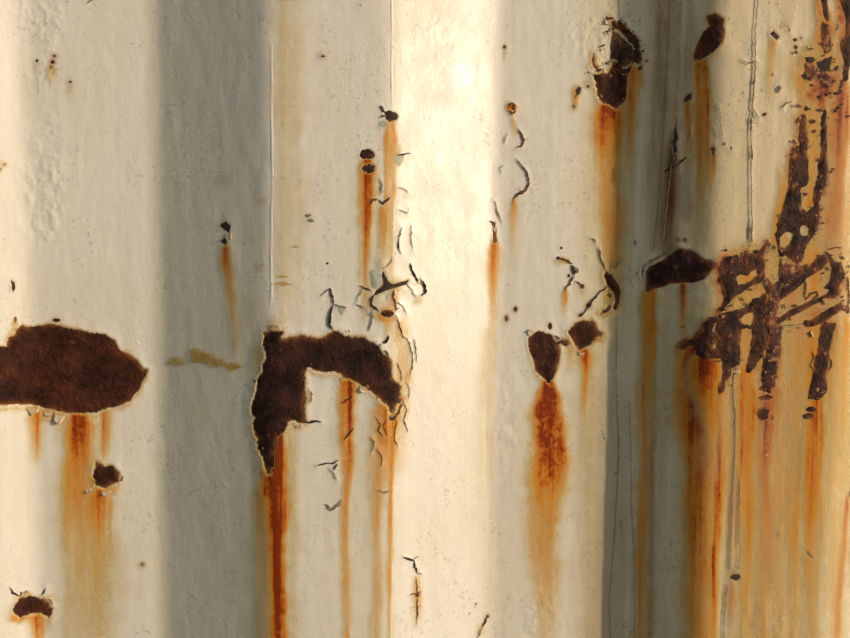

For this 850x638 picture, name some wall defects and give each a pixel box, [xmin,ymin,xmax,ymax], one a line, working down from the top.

corrosion [0,317,148,577]
corrosion [251,324,402,638]
corrosion [358,105,411,298]
corrosion [488,201,502,312]
corrosion [527,6,662,609]
corrosion [640,0,850,638]
corrosion [10,588,53,638]